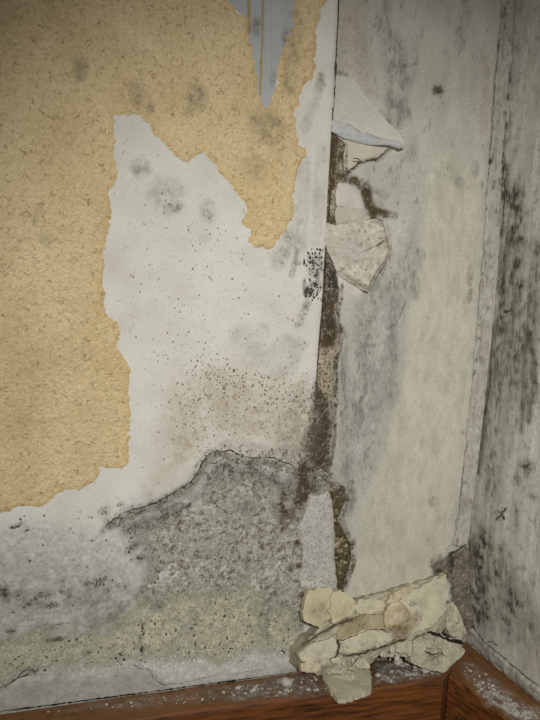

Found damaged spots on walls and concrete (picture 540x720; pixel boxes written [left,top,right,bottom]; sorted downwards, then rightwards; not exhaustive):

peeling [228,0,296,108]
peeling [331,76,404,178]
flaking render [325,206,391,300]
water stain [477,152,540,520]
water stain [144,246,425,592]
water stain [0,579,298,690]
water stain [118,496,204,571]
crack [102,449,300,532]
water stain [469,531,531,637]